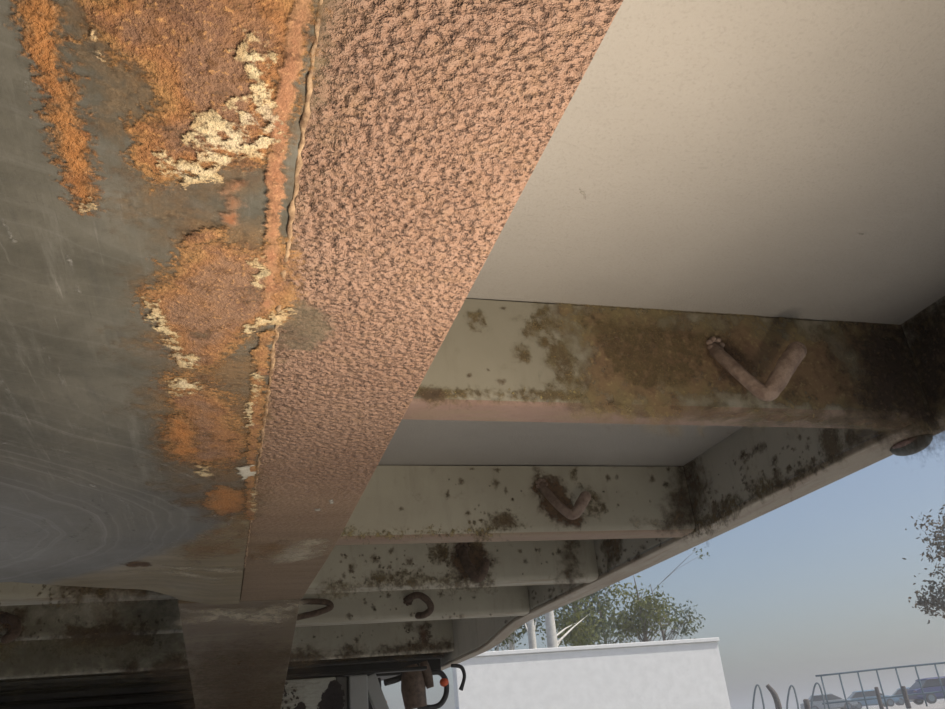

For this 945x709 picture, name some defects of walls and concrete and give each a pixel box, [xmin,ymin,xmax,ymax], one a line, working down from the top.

rust [10,0,334,522]
leakage [532,300,945,449]
rust [450,542,495,588]
rust [531,469,606,528]